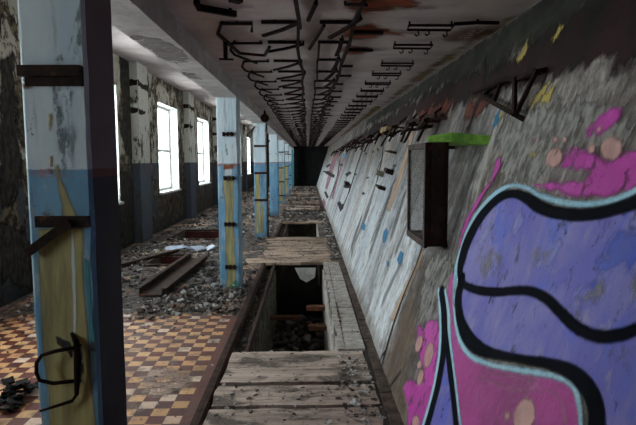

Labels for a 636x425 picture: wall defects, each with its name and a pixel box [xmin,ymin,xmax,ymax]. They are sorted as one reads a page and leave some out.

peeling [53,88,74,169]
peeling [119,57,132,160]
peeling [130,35,189,62]
peeling [152,79,186,222]
corrosion [342,0,636,146]